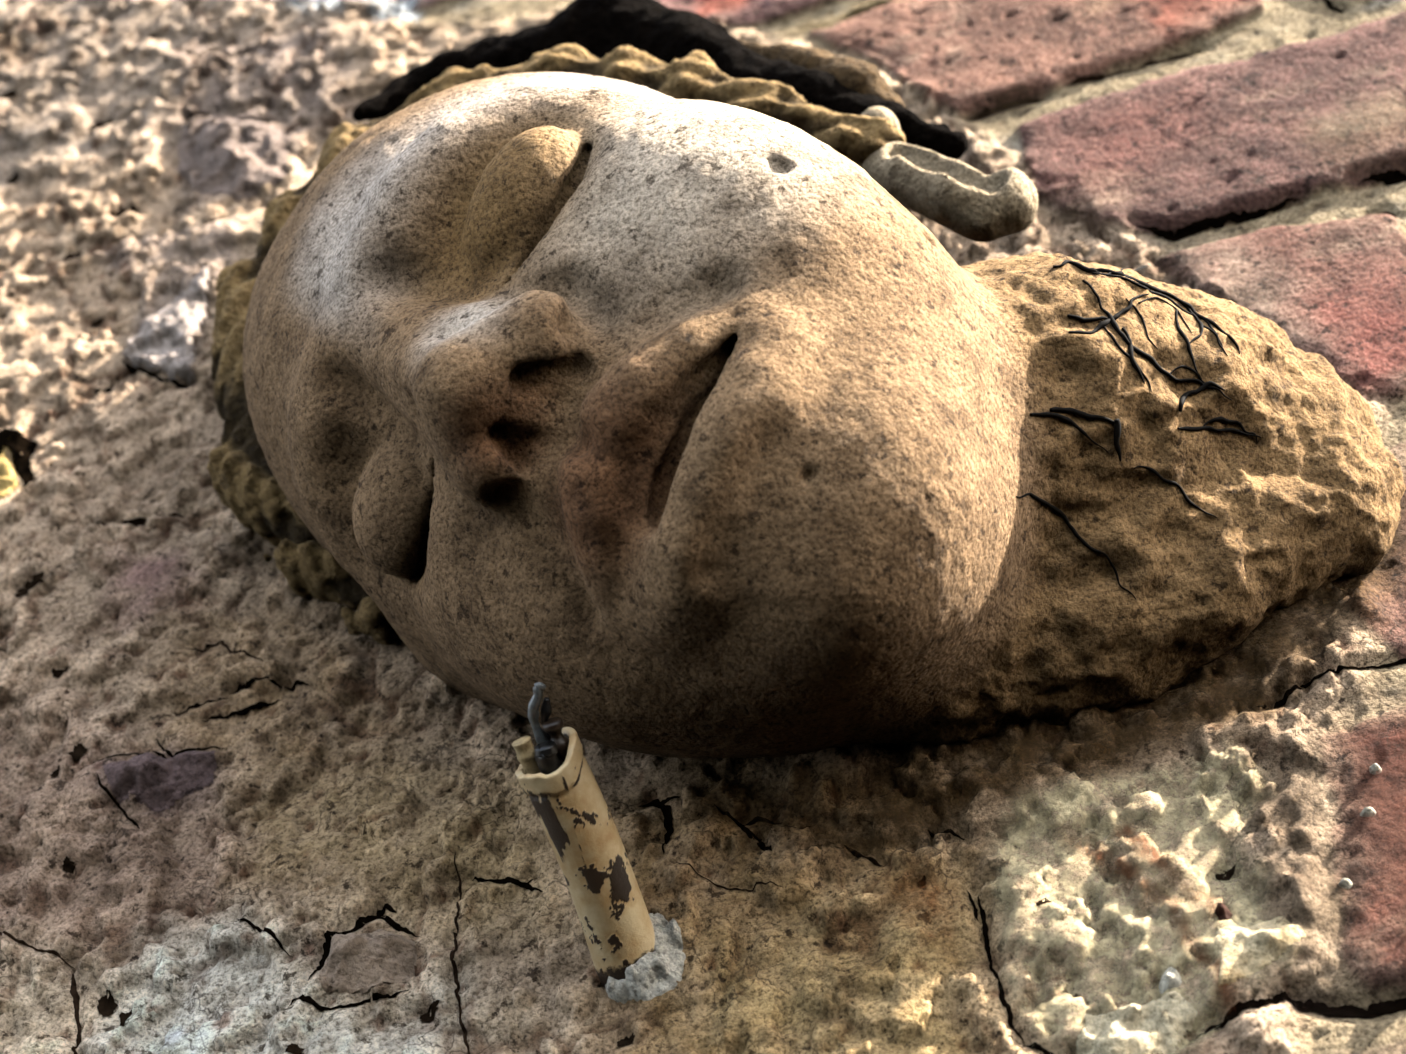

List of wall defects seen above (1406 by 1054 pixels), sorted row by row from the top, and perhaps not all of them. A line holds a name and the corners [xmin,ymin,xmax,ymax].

peeling [0,452,19,498]
crack [83,640,309,828]
crack [0,931,82,1054]
crack [237,903,419,1011]
crack [450,853,543,1054]
crack [967,891,1054,1054]